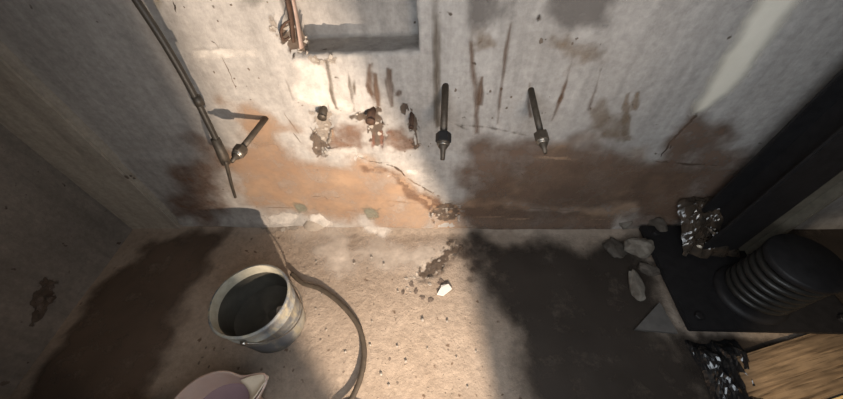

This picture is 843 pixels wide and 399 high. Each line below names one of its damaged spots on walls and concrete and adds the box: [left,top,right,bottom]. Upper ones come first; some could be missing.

leakage [470,0,496,25]
leakage [553,0,609,27]
spalling [298,102,341,157]
spalling [350,107,388,146]
spalling [400,103,431,156]
corrosion [228,43,681,228]
corrosion [170,161,223,222]
leakage [269,204,441,272]
spalling [401,241,464,303]